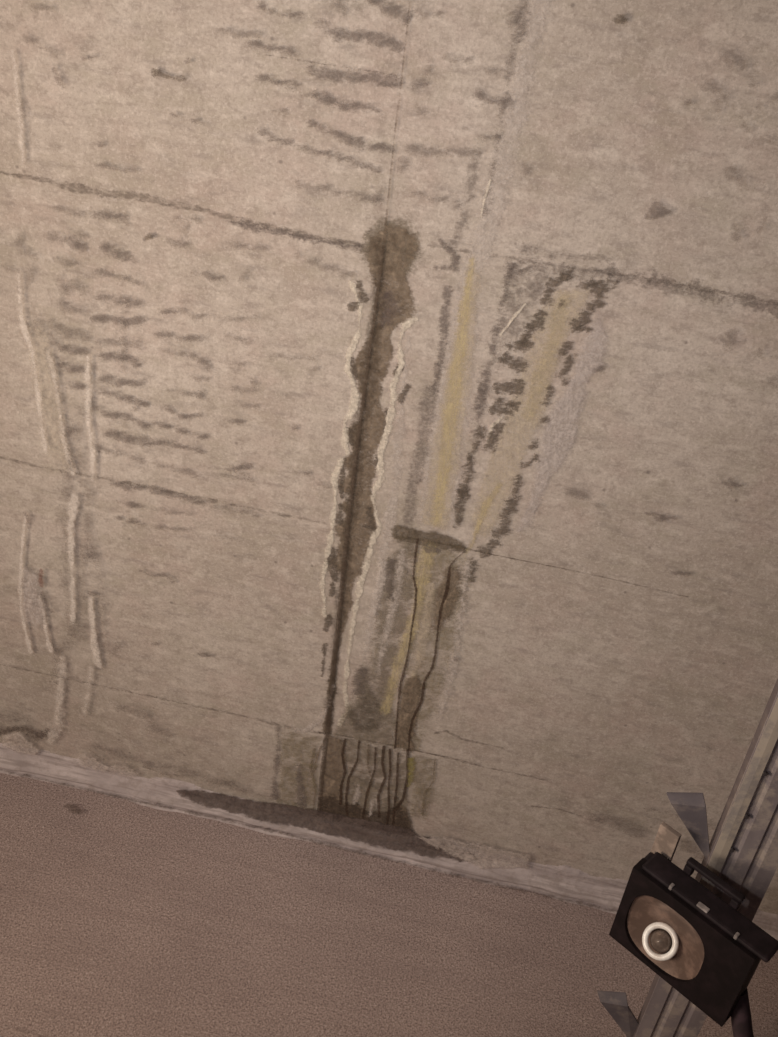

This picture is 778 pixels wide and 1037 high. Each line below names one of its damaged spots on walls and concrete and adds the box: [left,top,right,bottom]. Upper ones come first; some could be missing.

crack [317,163,392,811]
water stain [176,0,617,862]